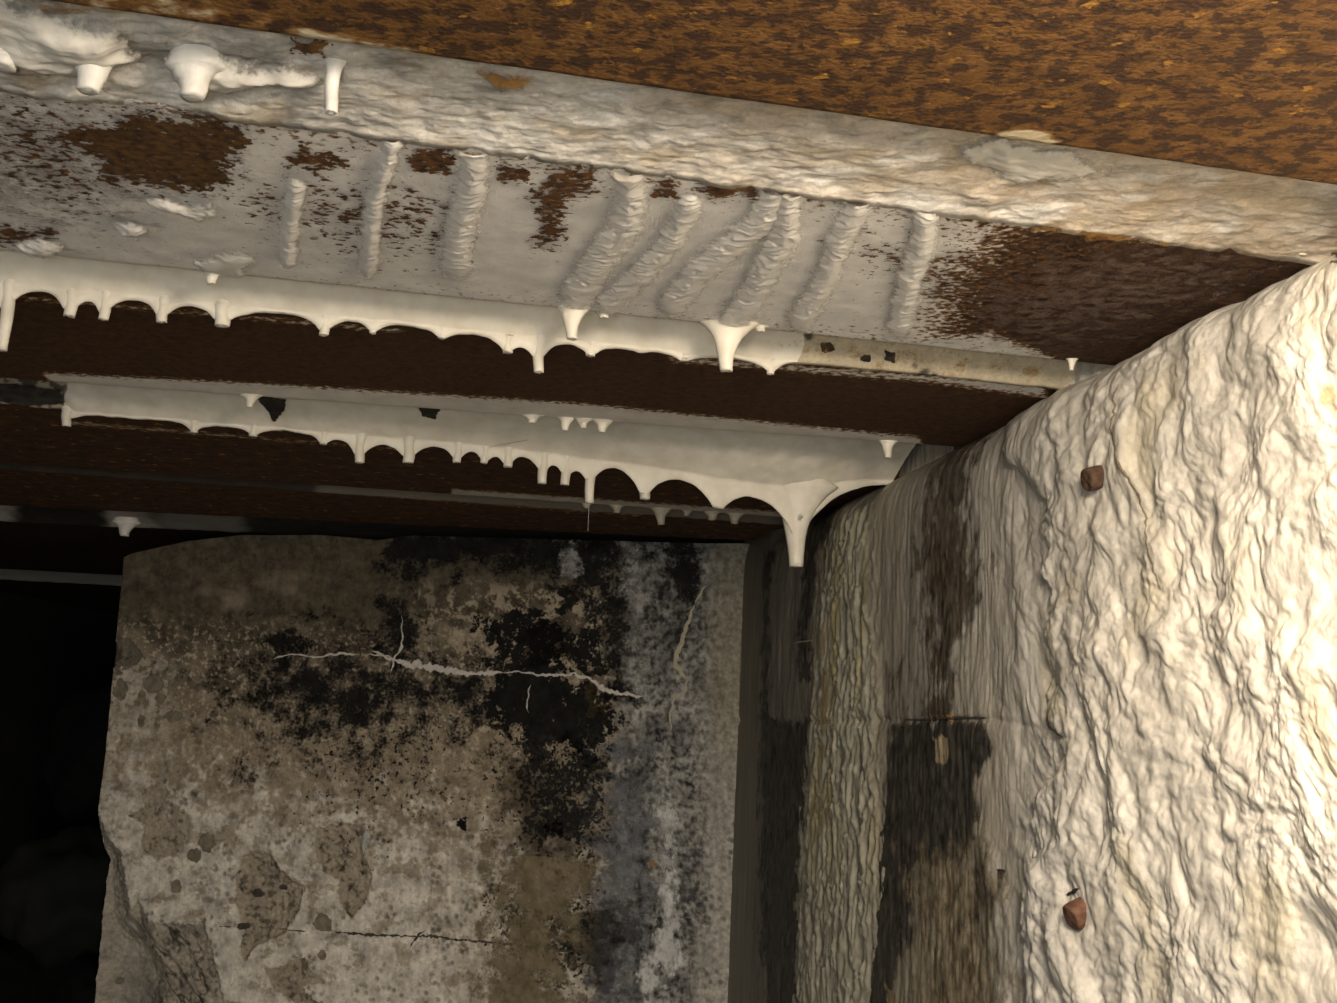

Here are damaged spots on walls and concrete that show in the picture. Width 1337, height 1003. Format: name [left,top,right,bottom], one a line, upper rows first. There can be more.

rust [0,91,376,279]
rust [377,149,458,286]
efflorescence [0,141,871,371]
rust [846,213,910,300]
rust [915,219,1242,355]
damp [64,382,916,682]
damp [191,536,707,1003]
crack [274,585,707,731]
damp [756,551,808,1003]
damp [869,426,1024,1003]